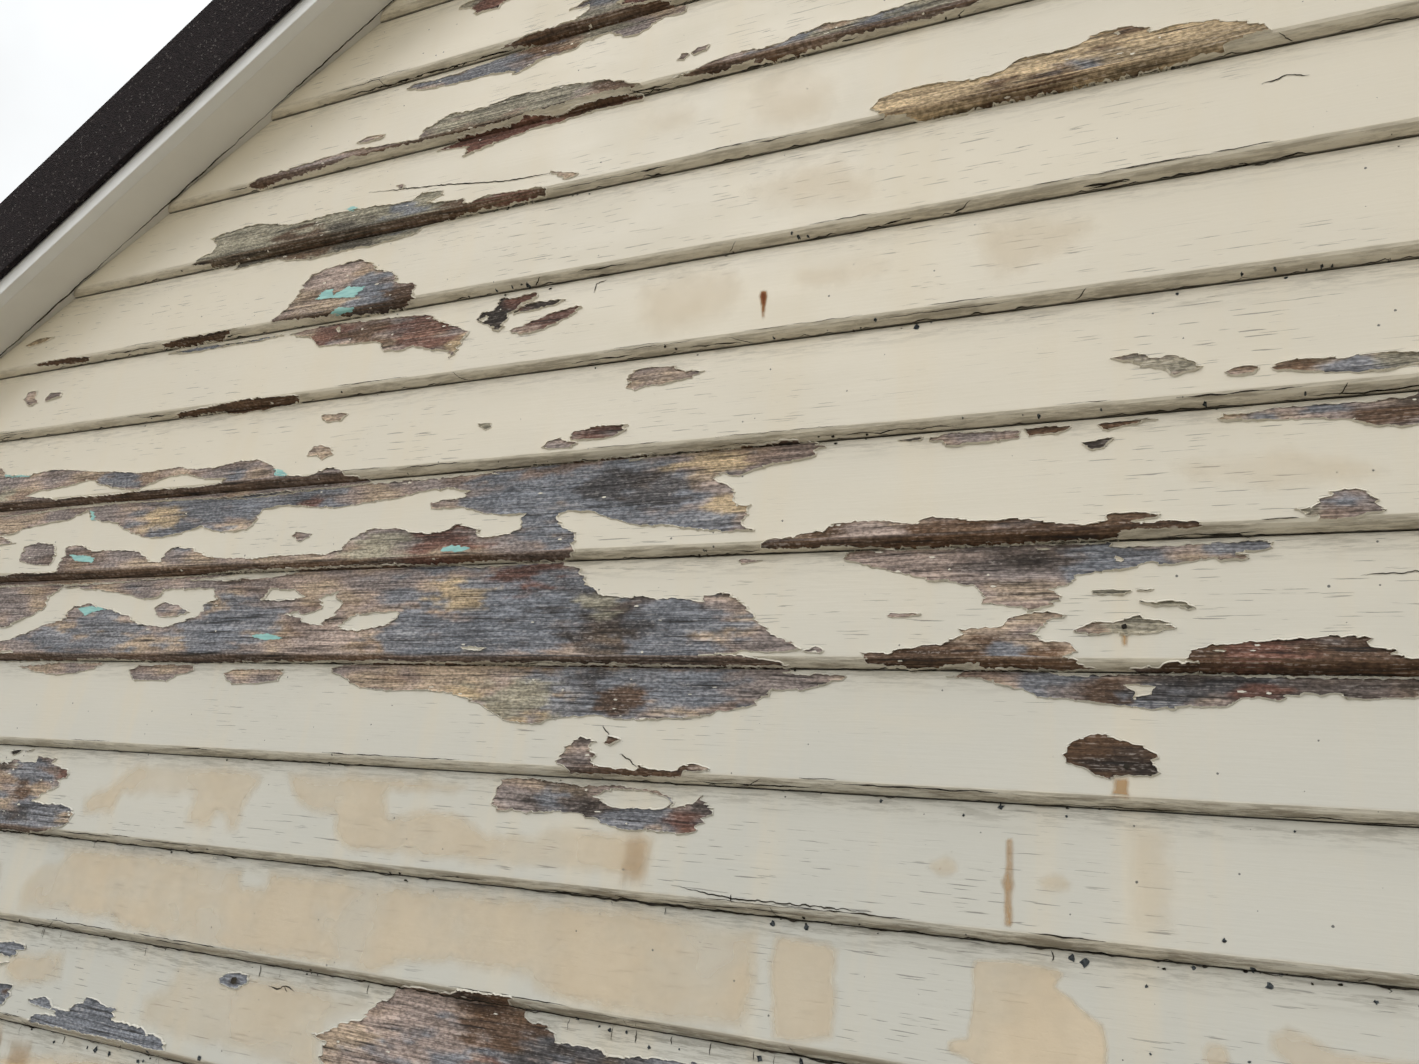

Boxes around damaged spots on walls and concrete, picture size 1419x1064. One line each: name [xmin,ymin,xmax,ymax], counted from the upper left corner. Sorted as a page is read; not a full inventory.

peeling [672,0,989,81]
peeling [870,19,1272,123]
peeling [161,171,583,359]
peeling [1110,352,1203,377]
peeling [1225,351,1419,377]
peeling [321,412,348,423]
peeling [1217,390,1419,428]
peeling [0,424,1419,836]
peeling [0,940,27,965]
peeling [0,983,13,1006]
peeling [27,996,166,1052]
peeling [311,985,721,1064]